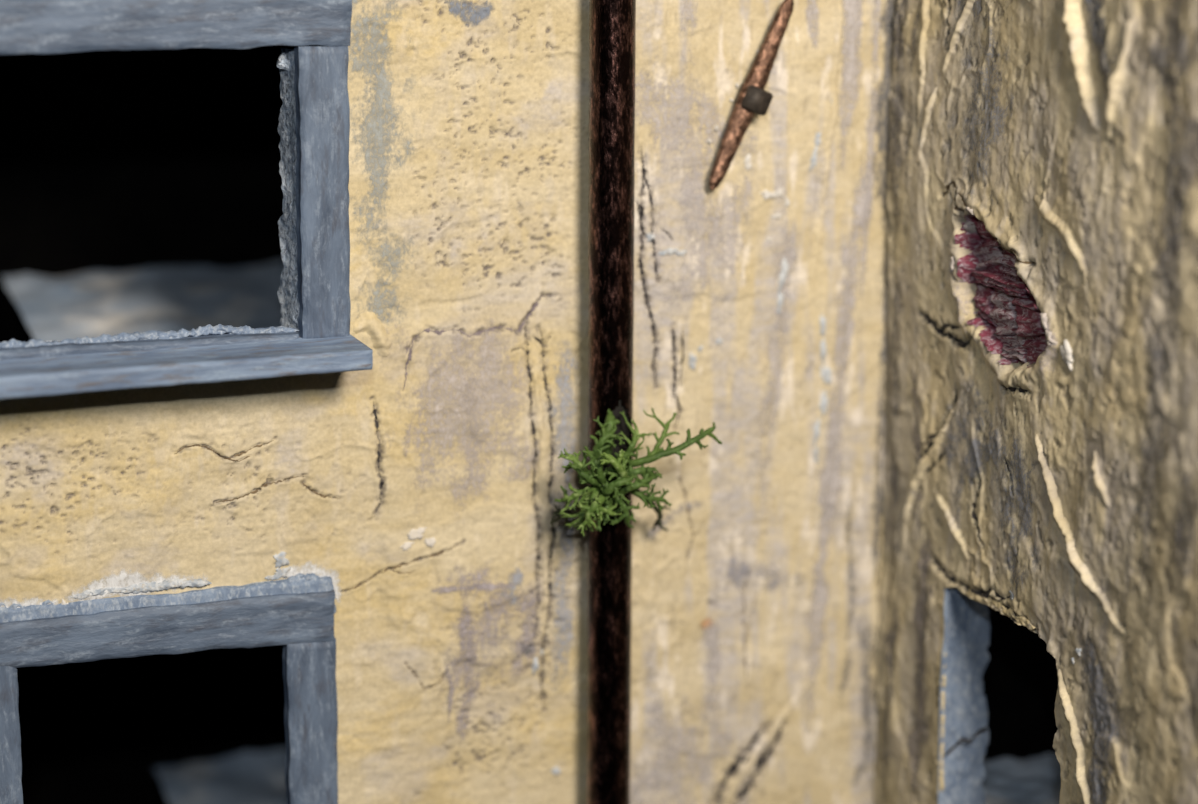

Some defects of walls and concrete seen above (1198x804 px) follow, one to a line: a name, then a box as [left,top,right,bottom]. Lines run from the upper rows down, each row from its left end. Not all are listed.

water stain [1084,0,1114,98]
water stain [1149,0,1198,311]
crack [637,150,684,426]
flaking render [949,206,1073,372]
crack [175,440,274,462]
crack [218,476,339,502]
crack [373,401,384,512]
crack [342,541,463,592]
crack [403,295,557,703]
water stain [841,260,932,799]
water stain [944,383,1037,590]
water stain [1083,638,1120,804]